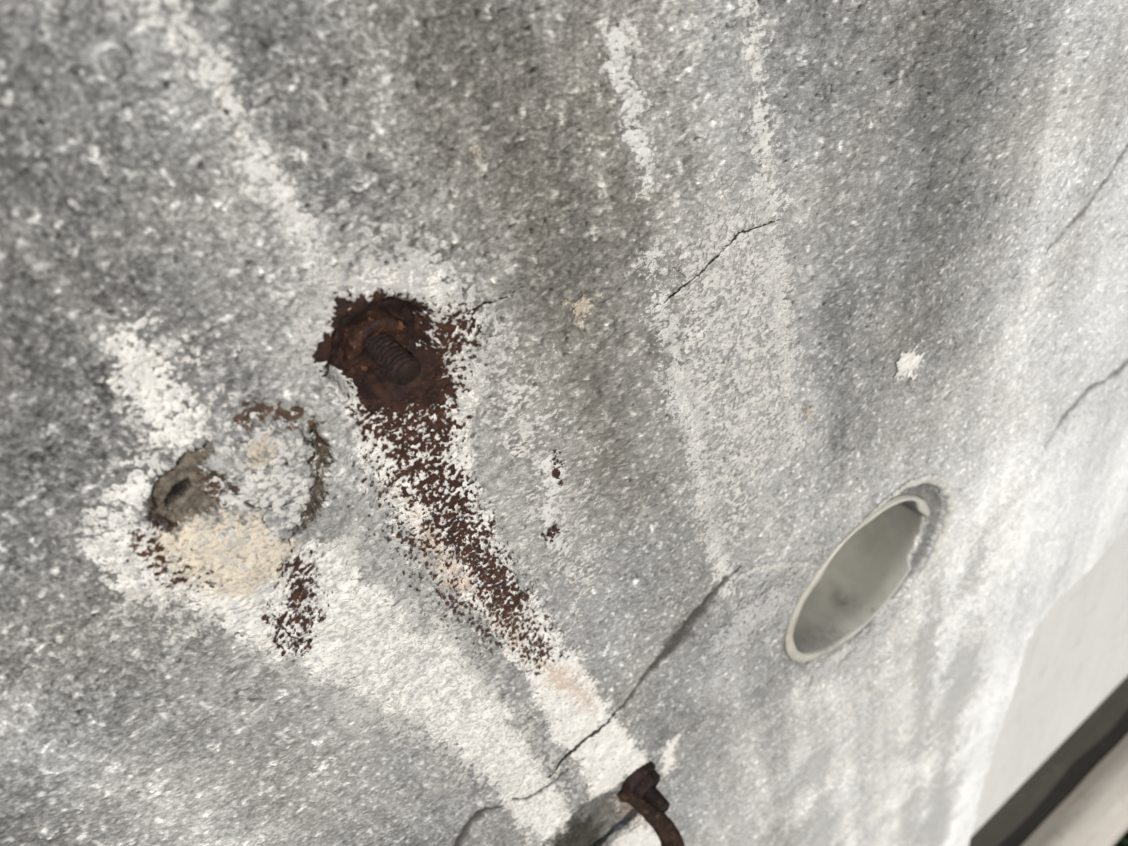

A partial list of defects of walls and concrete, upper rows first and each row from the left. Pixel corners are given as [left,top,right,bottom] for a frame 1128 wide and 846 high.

crack [657,219,780,305]
spalling [114,401,340,597]
rust [312,288,578,677]
rust [261,550,333,663]
crack [455,561,815,846]